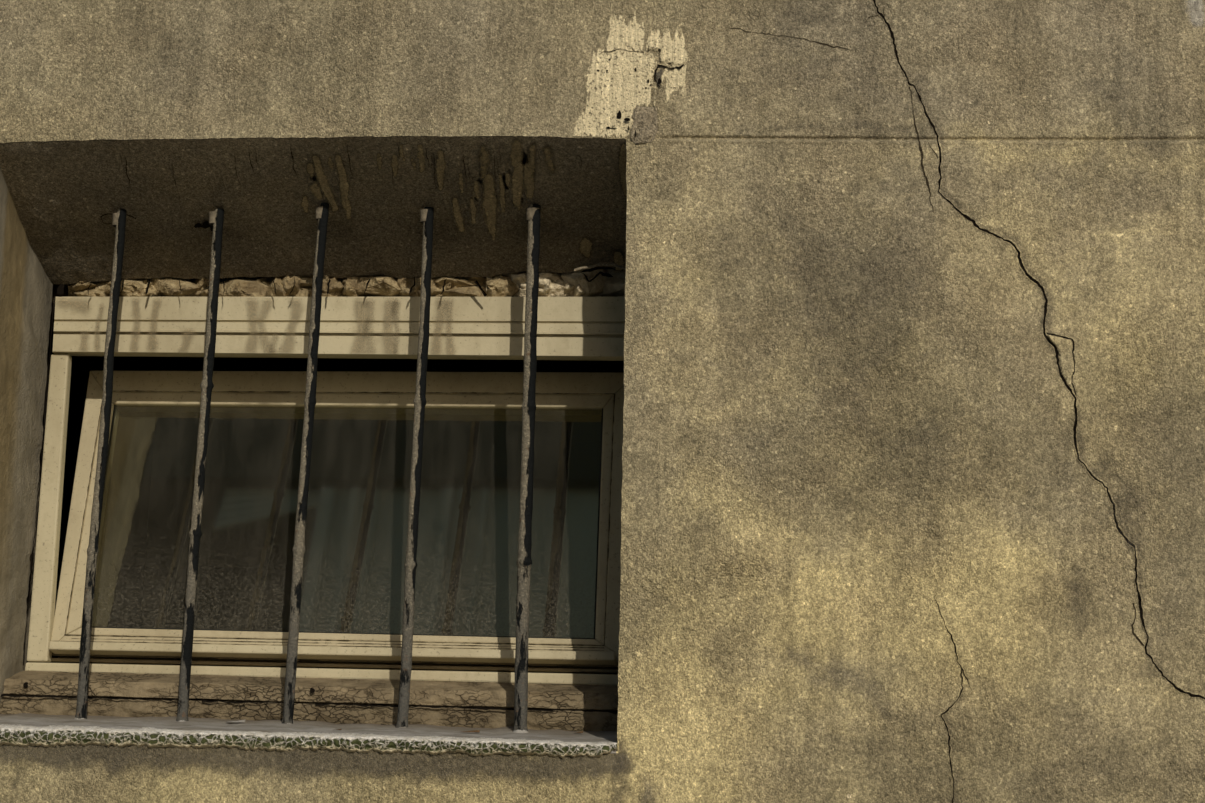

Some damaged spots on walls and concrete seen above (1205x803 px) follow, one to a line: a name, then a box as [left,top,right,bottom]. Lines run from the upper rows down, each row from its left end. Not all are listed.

spalling [573,12,690,144]
crack [725,26,858,51]
flaking render [52,262,626,301]
crack [868,0,1205,702]
crack [932,575,972,803]